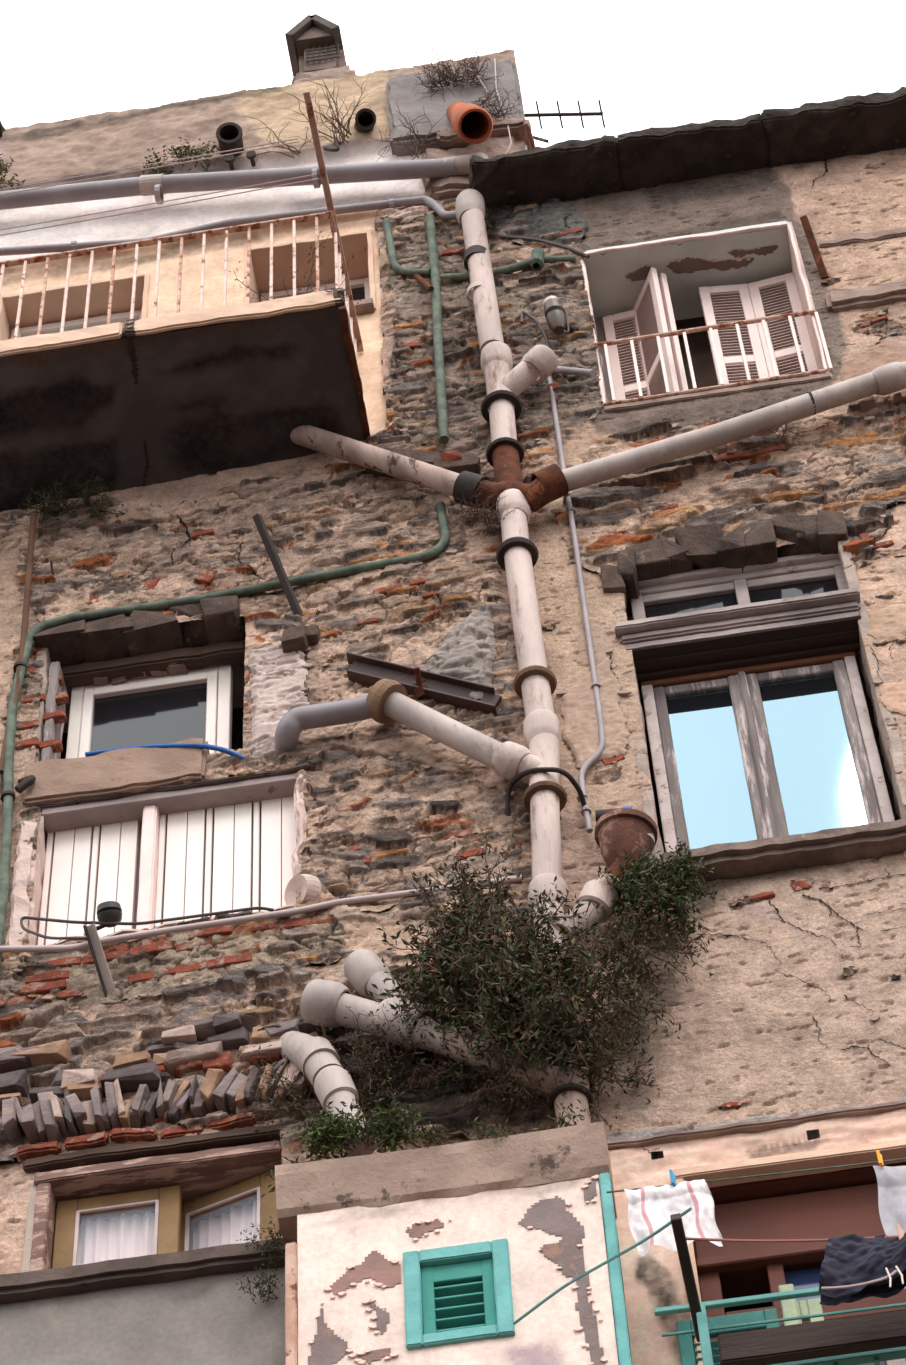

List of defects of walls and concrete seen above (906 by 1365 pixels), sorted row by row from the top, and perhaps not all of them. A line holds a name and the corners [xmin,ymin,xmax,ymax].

peeling [625,245,779,282]
spalling [551,398,906,575]
spalling [15,477,487,685]
crack [697,868,906,1066]
peeling [308,1251,401,1365]
peeling [406,1217,451,1241]
peeling [518,1174,608,1365]